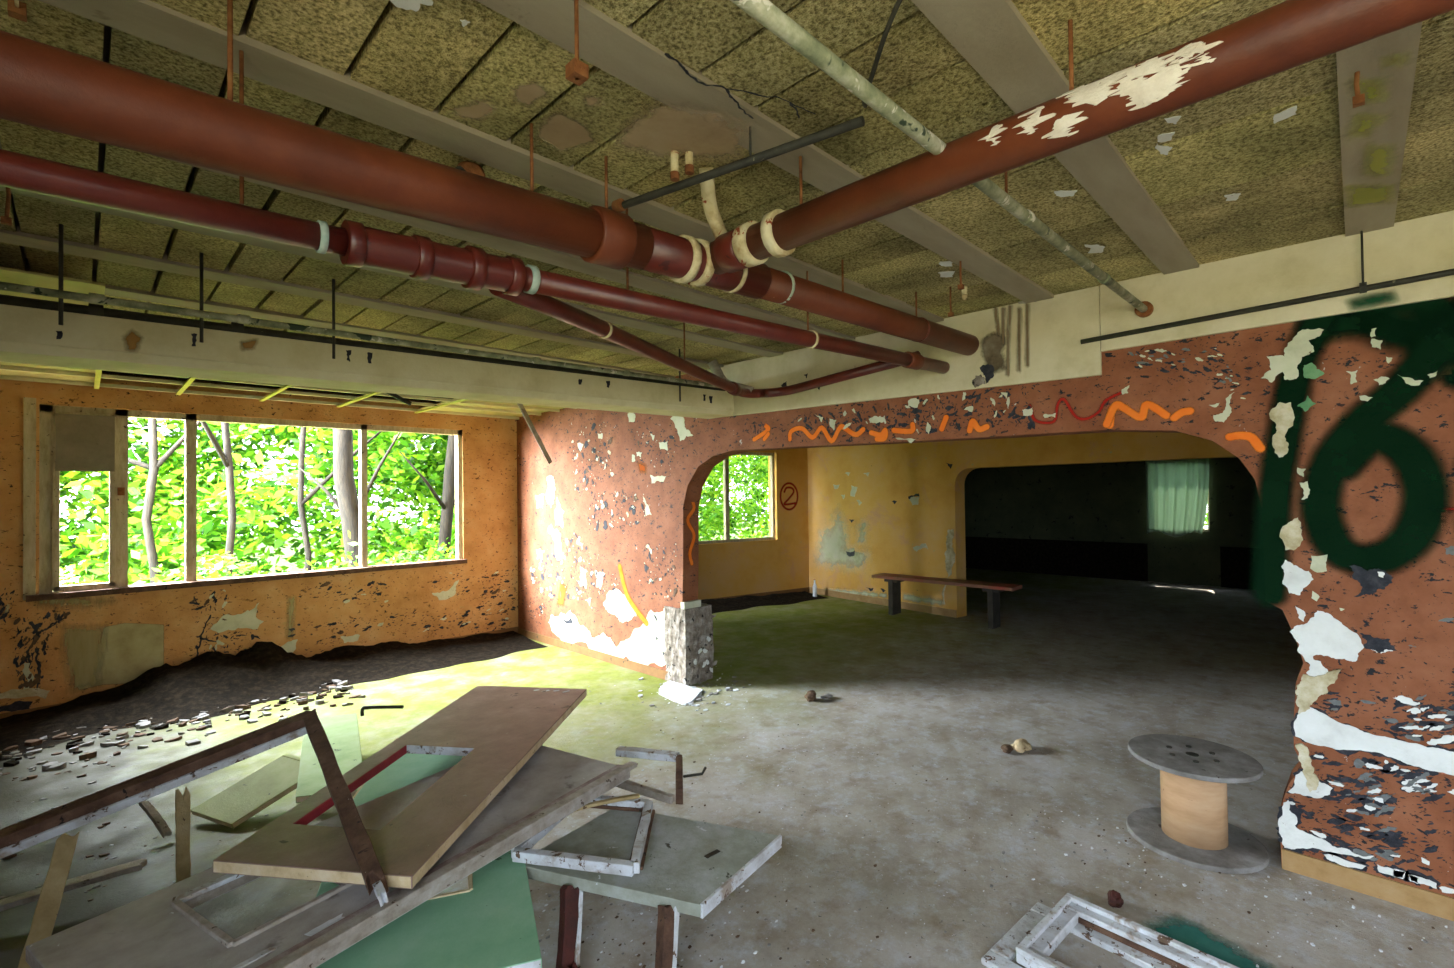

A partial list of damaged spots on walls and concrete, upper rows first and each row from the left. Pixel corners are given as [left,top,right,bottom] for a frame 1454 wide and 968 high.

peeling [978,41,1224,146]
peeling [1155,116,1181,155]
peeling [1273,105,1297,124]
peeling [791,364,1056,443]
peeling [1127,346,1251,422]
peeling [1262,328,1324,500]
peeling [1346,328,1437,401]
spalling [281,413,758,711]
peeling [1275,518,1454,894]